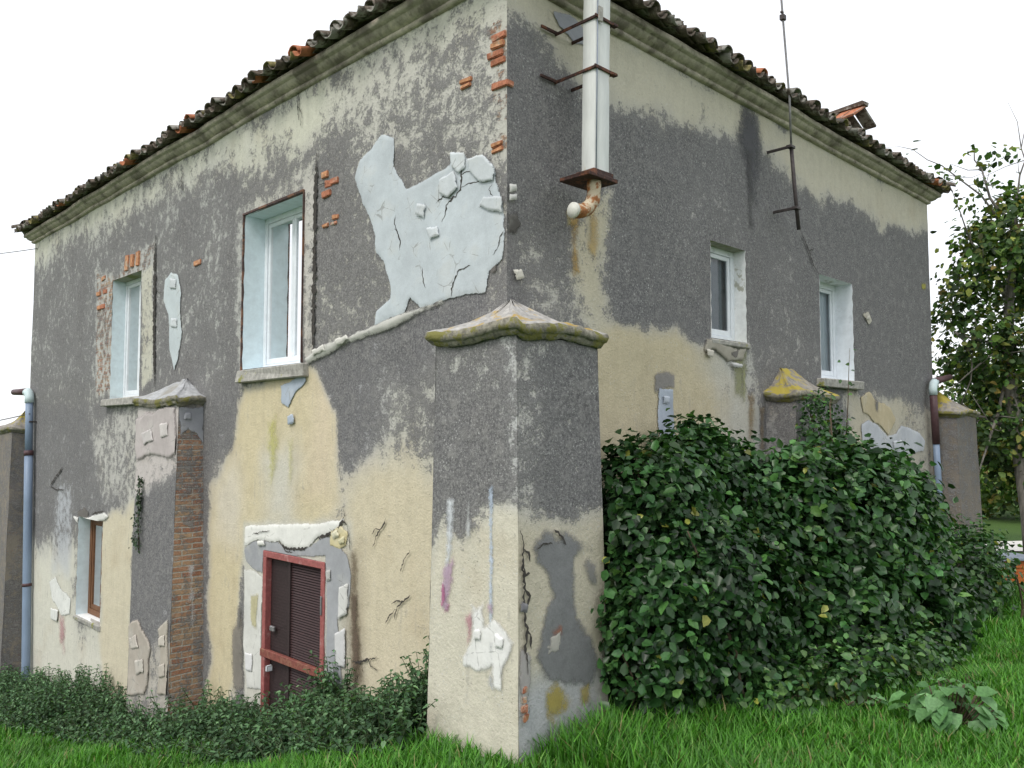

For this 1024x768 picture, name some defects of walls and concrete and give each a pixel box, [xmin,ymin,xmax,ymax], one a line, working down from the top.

flaking render [487,30,507,68]
flaking render [491,79,514,91]
flaking render [321,170,339,199]
crack [436,170,503,220]
water stain [739,113,762,224]
flaking render [124,251,141,271]
peeling [163,272,182,369]
peeling [281,377,306,424]
spalling [135,406,192,460]
spalling [243,525,351,689]
crack [385,595,410,623]
crack [520,531,532,667]